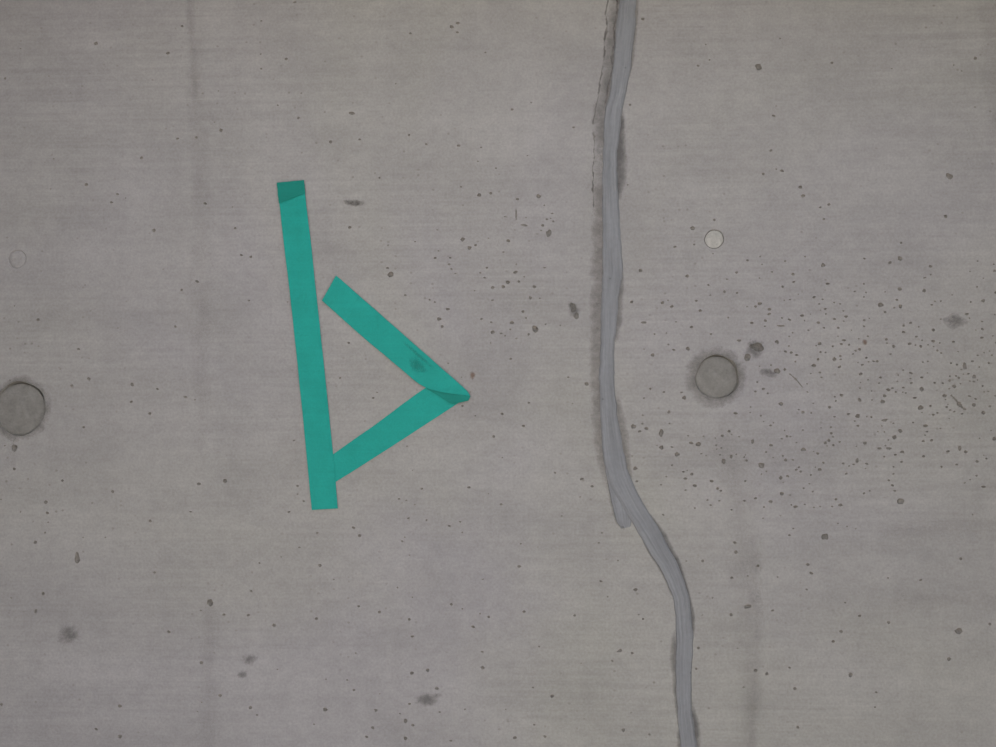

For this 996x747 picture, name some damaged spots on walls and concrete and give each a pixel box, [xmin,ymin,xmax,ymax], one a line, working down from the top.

crack [599,0,698,747]